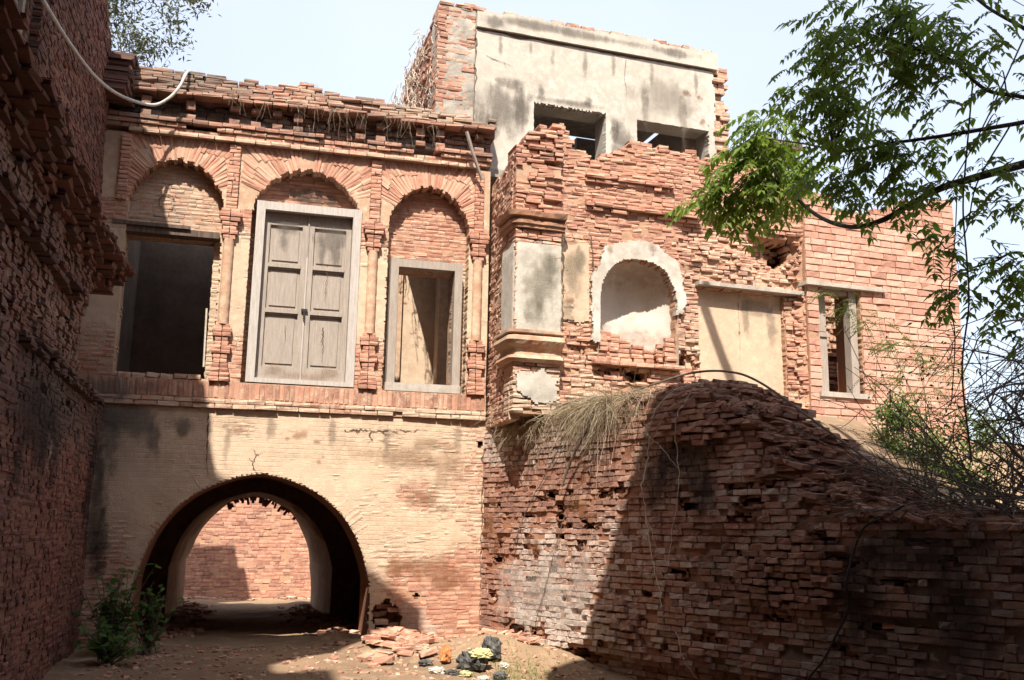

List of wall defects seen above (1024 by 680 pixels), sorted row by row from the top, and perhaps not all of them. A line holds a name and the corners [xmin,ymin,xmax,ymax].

water stain [516,20,606,39]
water stain [486,81,524,123]
water stain [612,124,628,147]
spalling [759,235,795,274]
spalling [679,350,698,377]
spalling [597,366,649,387]
crack [345,428,428,442]
spalling [594,482,631,500]
spalling [679,499,698,511]
spalling [539,489,600,551]
spalling [669,567,690,581]
spalling [504,619,546,639]